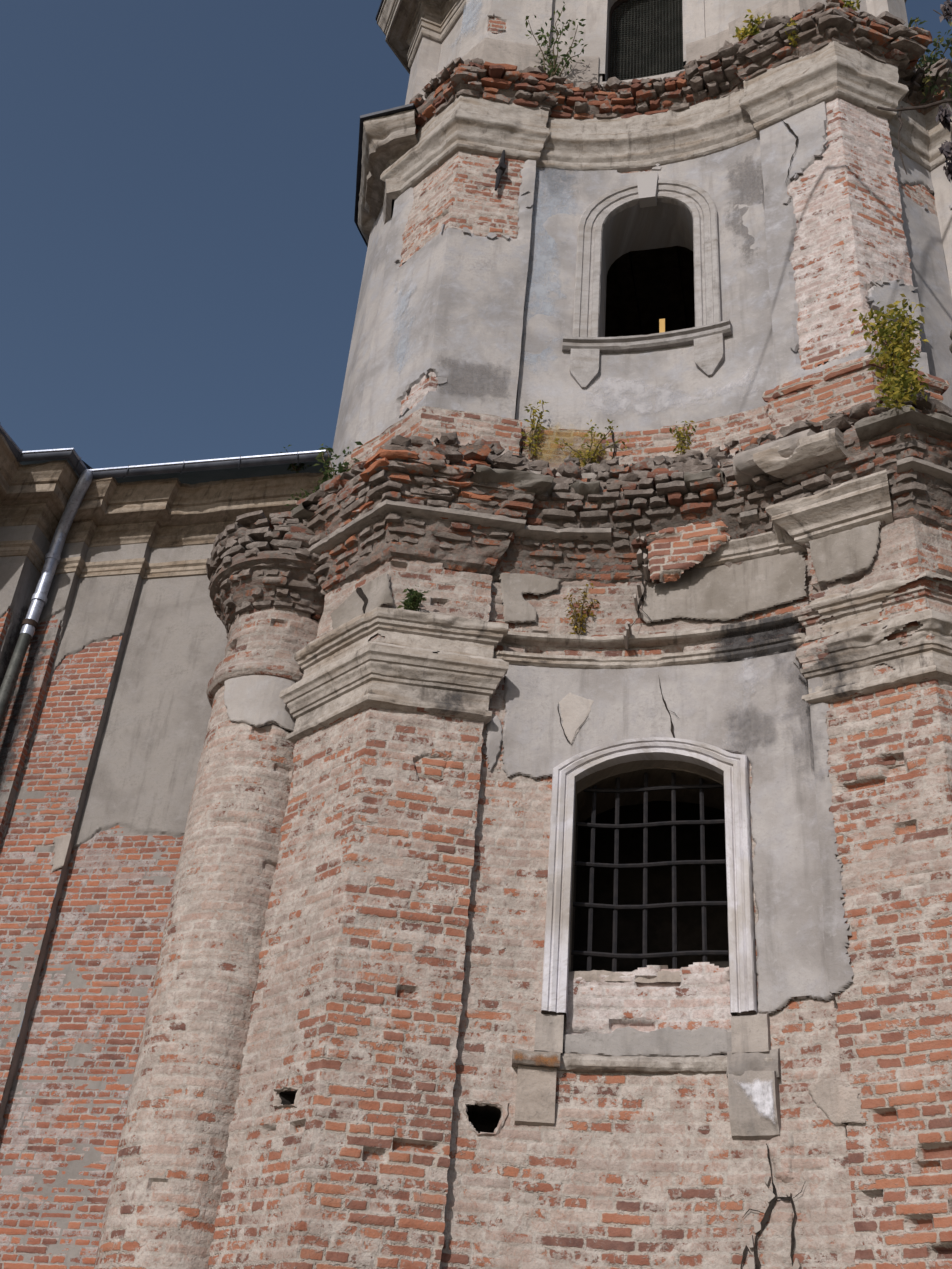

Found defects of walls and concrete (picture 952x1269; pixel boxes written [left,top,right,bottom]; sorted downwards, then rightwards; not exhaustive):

flaking render [394,151,532,267]
flaking render [782,97,952,370]
flaking render [646,521,731,583]
crack [658,675,679,738]
flaking render [0,615,184,1269]
hole [461,1099,509,1136]
crack [740,1143,805,1269]